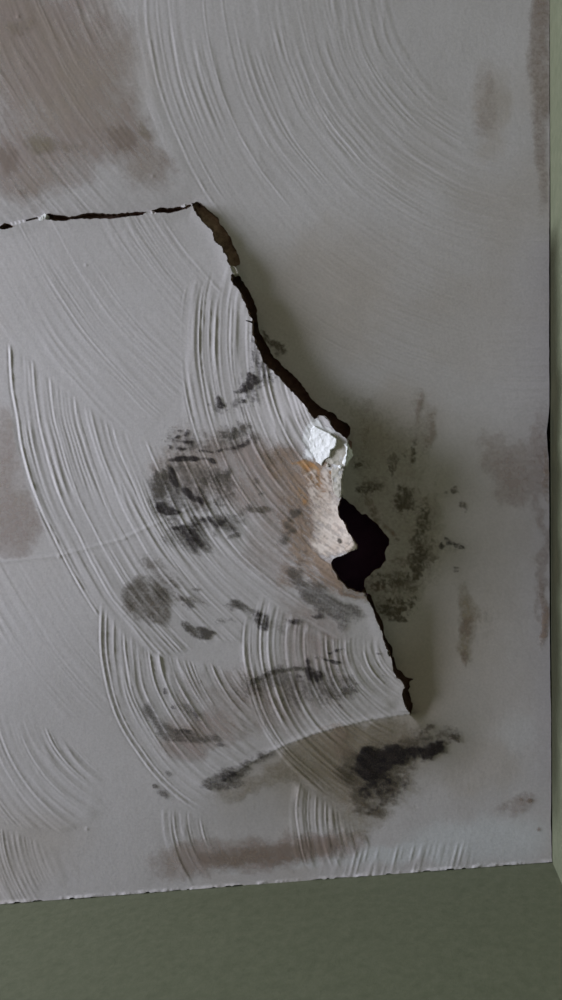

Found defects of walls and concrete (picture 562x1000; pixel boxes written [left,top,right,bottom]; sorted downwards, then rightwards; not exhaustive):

damp [0,0,150,194]
crack [0,202,352,449]
damp [151,425,307,551]
peeling [302,415,389,594]
mould [124,577,193,623]
mould [182,622,214,640]
damp [245,659,357,706]
mould [287,568,360,622]
crack [363,589,413,715]
mould [203,753,272,790]
damp [287,724,460,816]
damp [169,835,356,873]